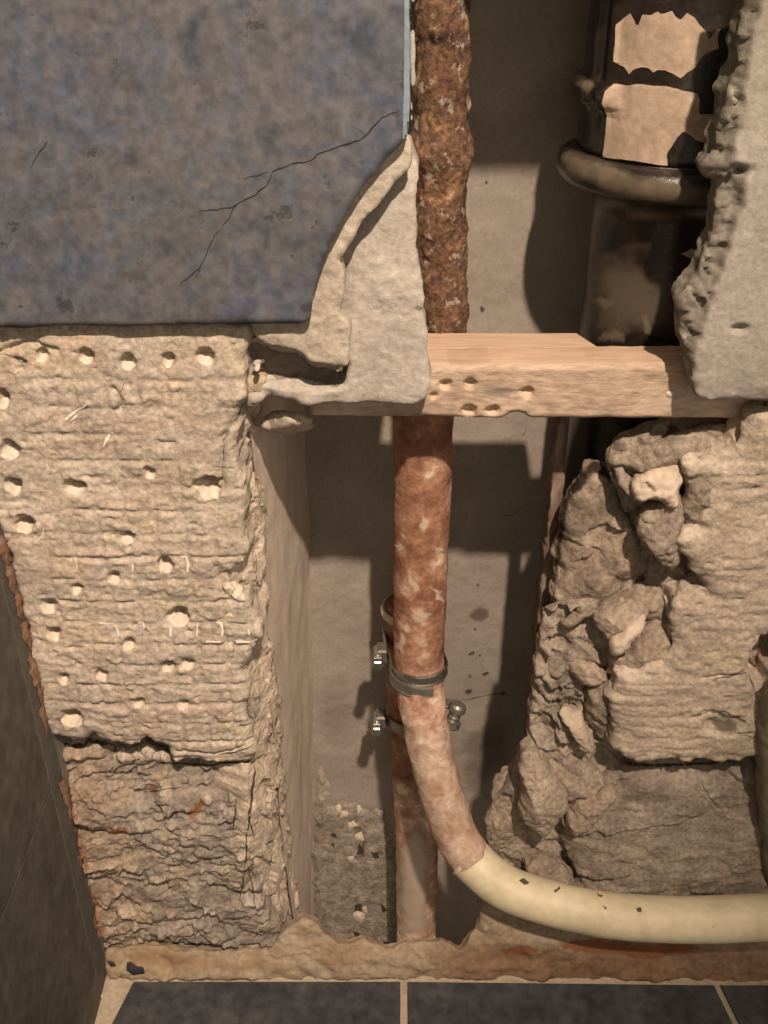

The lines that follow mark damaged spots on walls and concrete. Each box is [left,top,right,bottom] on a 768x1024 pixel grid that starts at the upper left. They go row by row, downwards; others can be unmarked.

crack [183,111,399,281]
crack [64,700,283,901]
spalling [311,766,397,944]
spalling [714,717,736,733]